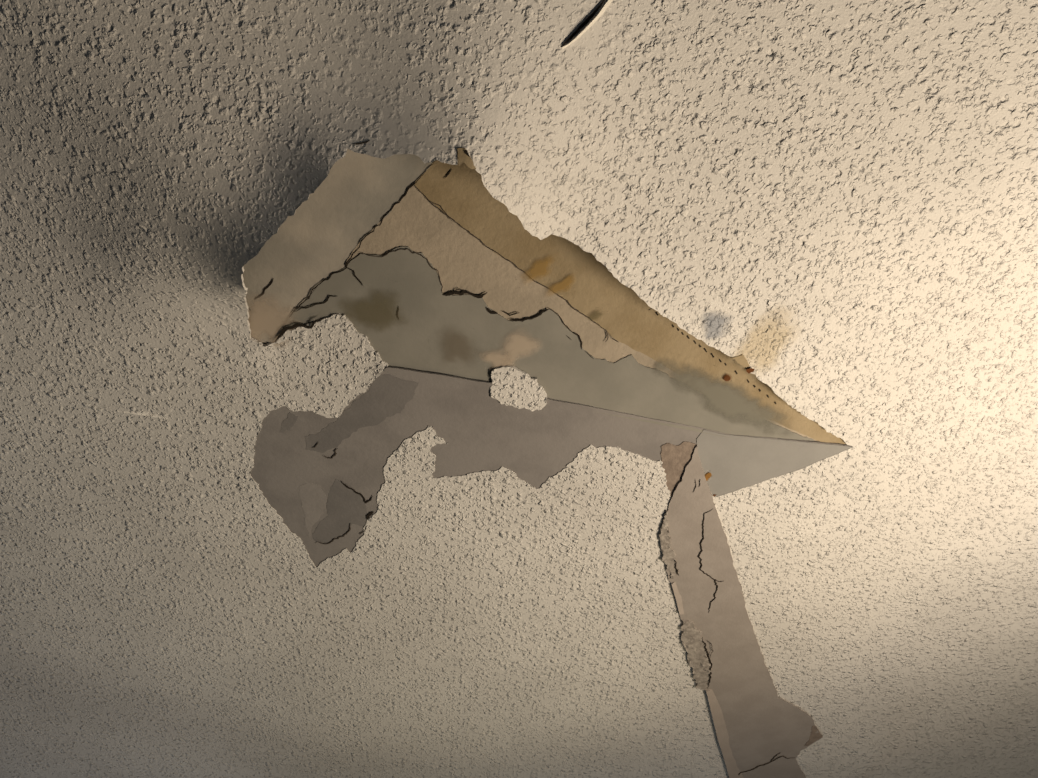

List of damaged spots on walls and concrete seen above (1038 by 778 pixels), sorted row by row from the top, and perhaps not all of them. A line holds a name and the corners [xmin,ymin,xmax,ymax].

crack [562,0,613,49]
peeling [732,354,755,373]
crack [312,443,374,544]
peeling [250,365,853,778]
crack [675,479,723,613]
crack [702,637,713,689]
crack [738,753,789,775]